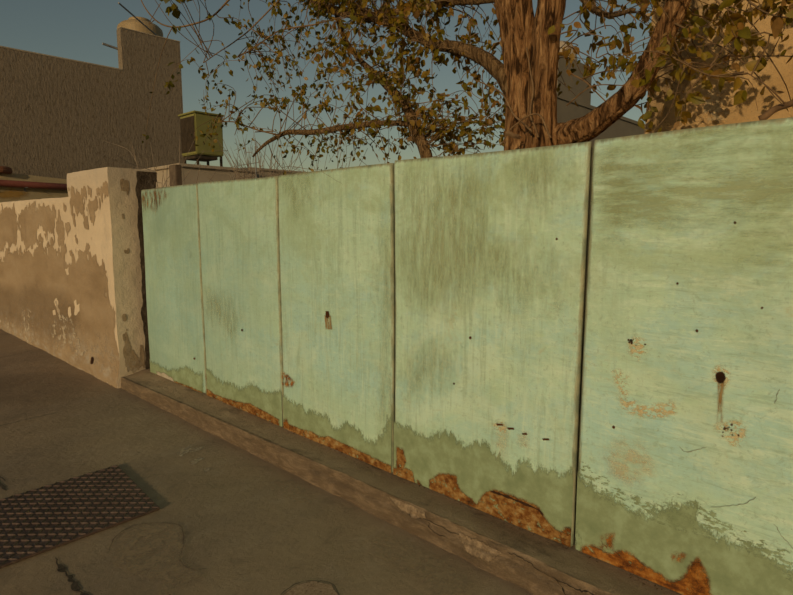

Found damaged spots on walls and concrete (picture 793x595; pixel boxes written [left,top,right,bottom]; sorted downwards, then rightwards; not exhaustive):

corrosion [156,371,571,548]
peeling [0,171,793,595]
crack [509,553,594,595]
corrosion [582,535,709,595]